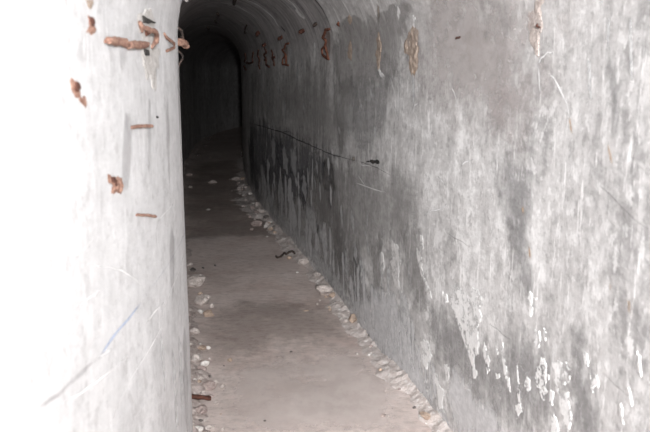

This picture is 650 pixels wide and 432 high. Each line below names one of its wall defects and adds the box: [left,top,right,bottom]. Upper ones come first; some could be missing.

rust [104,36,150,50]
spalling [404,15,419,75]
spalling [527,0,544,57]
water stain [248,120,436,402]
peeling [441,284,573,432]
peeling [583,351,600,393]